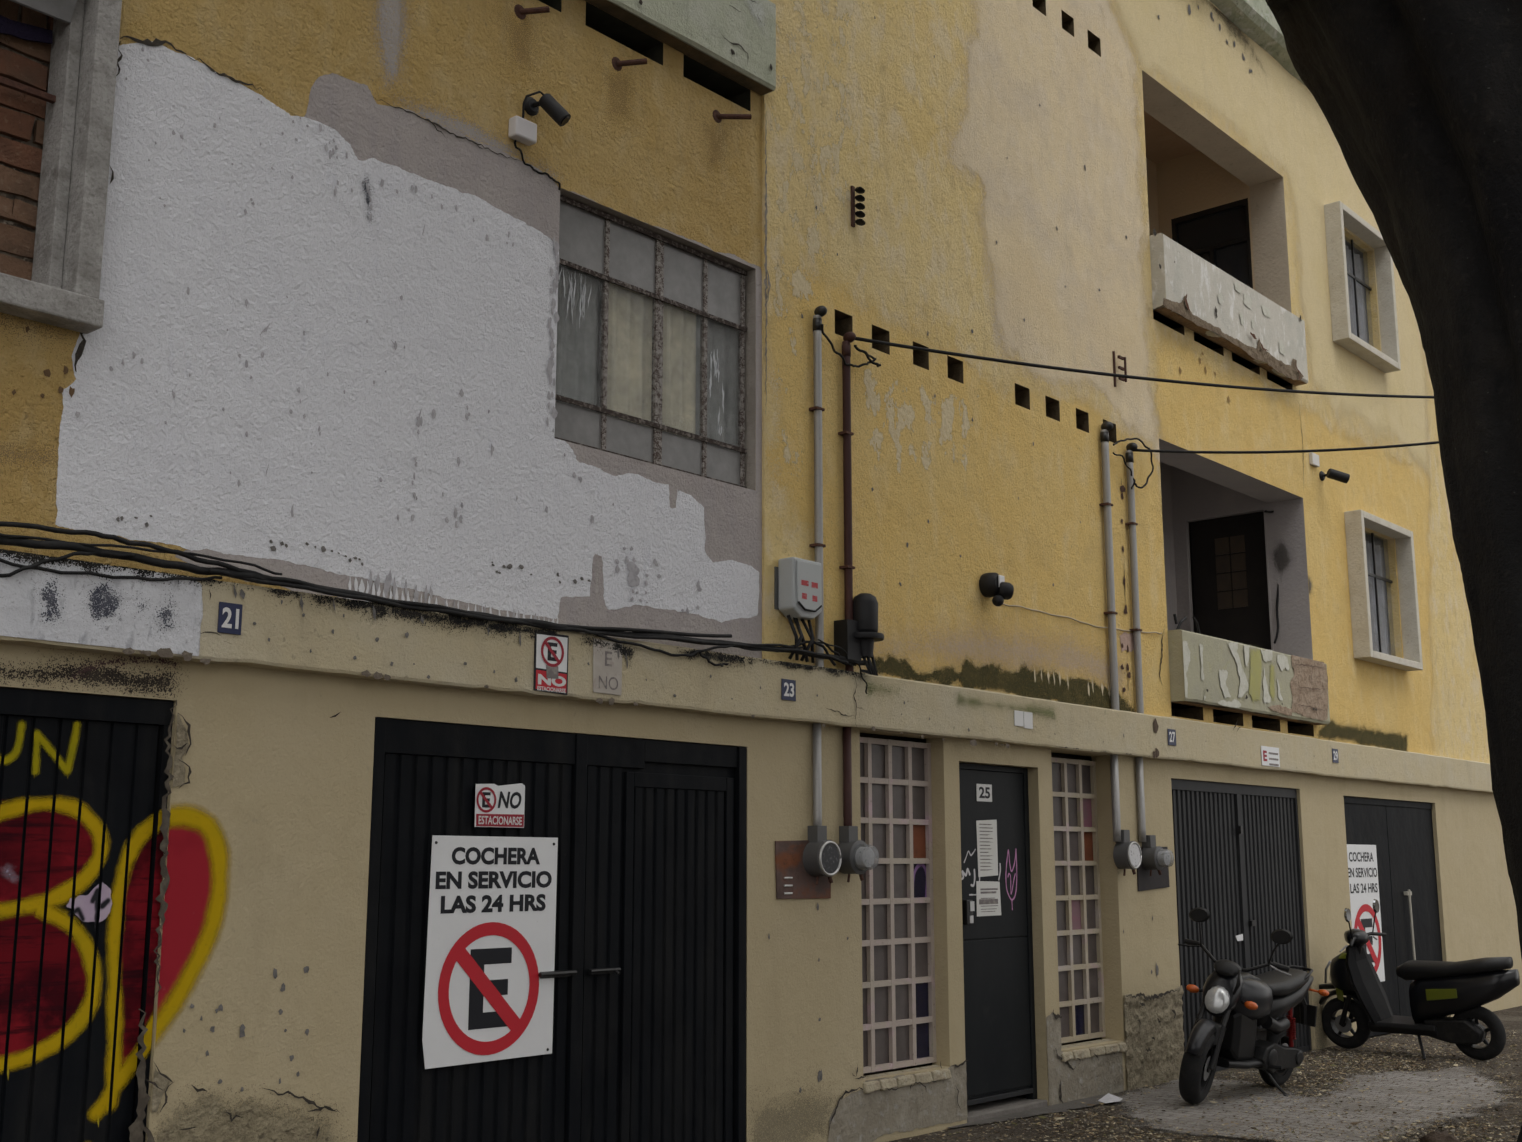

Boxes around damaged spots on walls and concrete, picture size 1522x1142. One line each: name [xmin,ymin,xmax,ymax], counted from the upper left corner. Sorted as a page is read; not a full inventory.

peeling [334,179,475,222]
flaking render [1163,296,1304,380]
peeling [615,546,661,603]
flaking render [122,647,211,665]
damp [677,606,1134,726]
flaking render [1183,641,1328,721]
flaking render [173,712,192,788]
flaking render [1046,985,1185,1106]
flaking render [146,1055,351,1142]
flaking render [827,1062,968,1142]